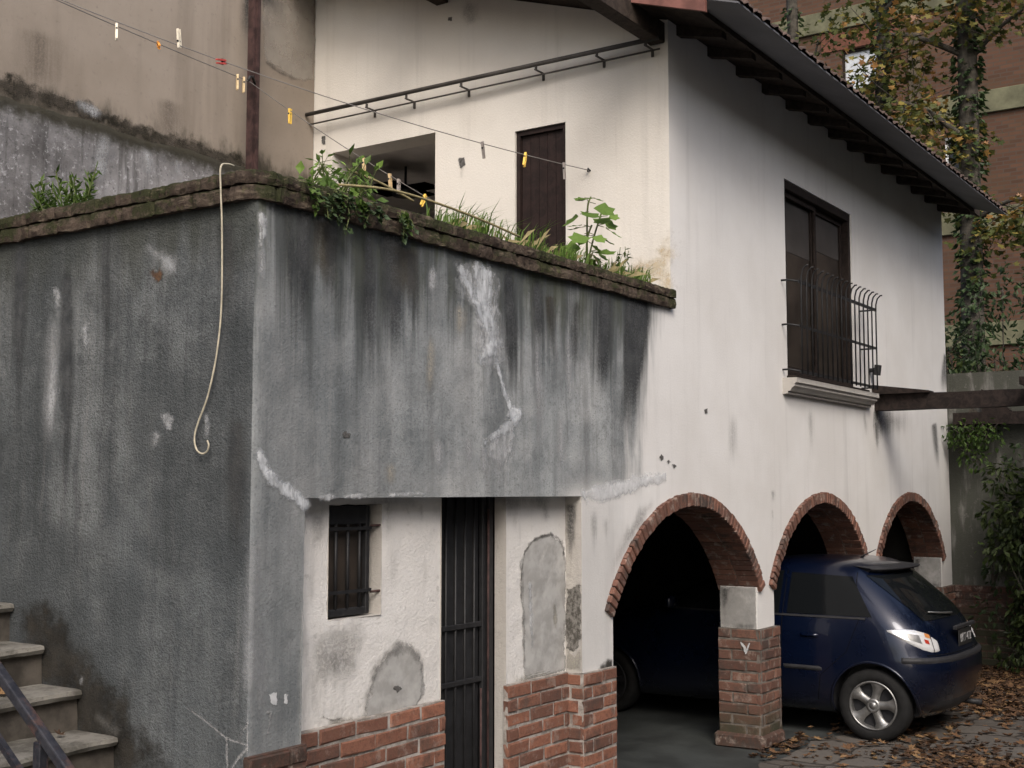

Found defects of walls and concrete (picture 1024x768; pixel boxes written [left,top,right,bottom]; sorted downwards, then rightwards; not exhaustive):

water stain [0,73,244,172]
water stain [48,275,72,449]
water stain [224,224,232,280]
water stain [259,213,267,238]
water stain [363,228,417,342]
water stain [505,272,517,369]
water stain [597,292,611,377]
water stain [624,298,650,404]
flaking render [567,505,575,542]
flaking render [554,584,581,669]
water stain [25,602,152,768]